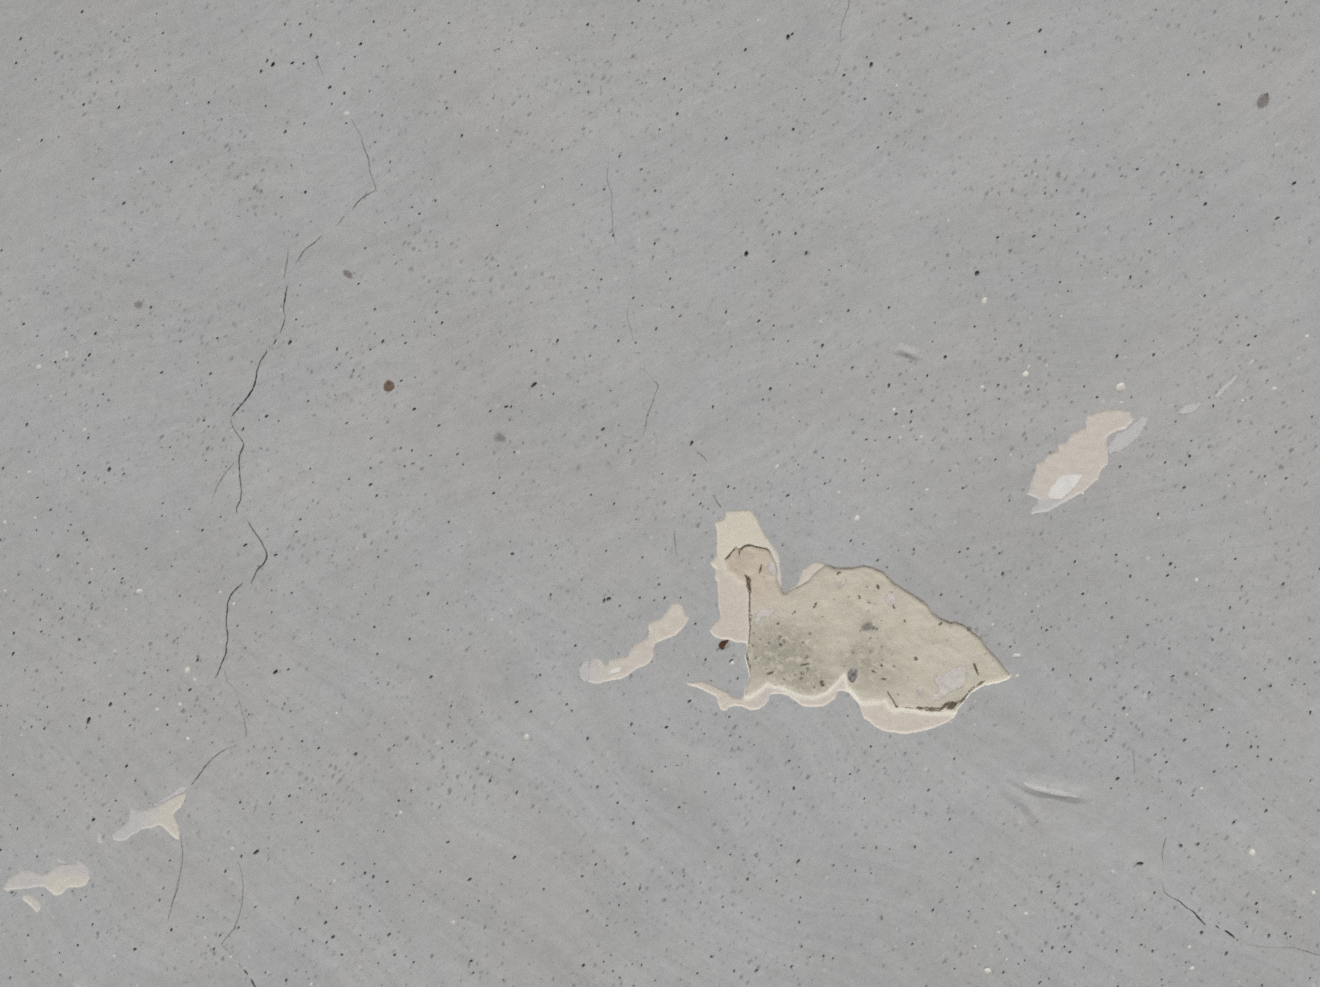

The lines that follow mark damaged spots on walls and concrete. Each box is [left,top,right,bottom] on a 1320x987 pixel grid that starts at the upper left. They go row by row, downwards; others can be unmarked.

peeling [1027,409,1149,514]
crack [168,121,376,920]
peeling [579,603,689,684]
spalling [686,510,1011,734]
peeling [97,786,187,844]
peeling [3,858,90,912]
crack [222,862,256,987]